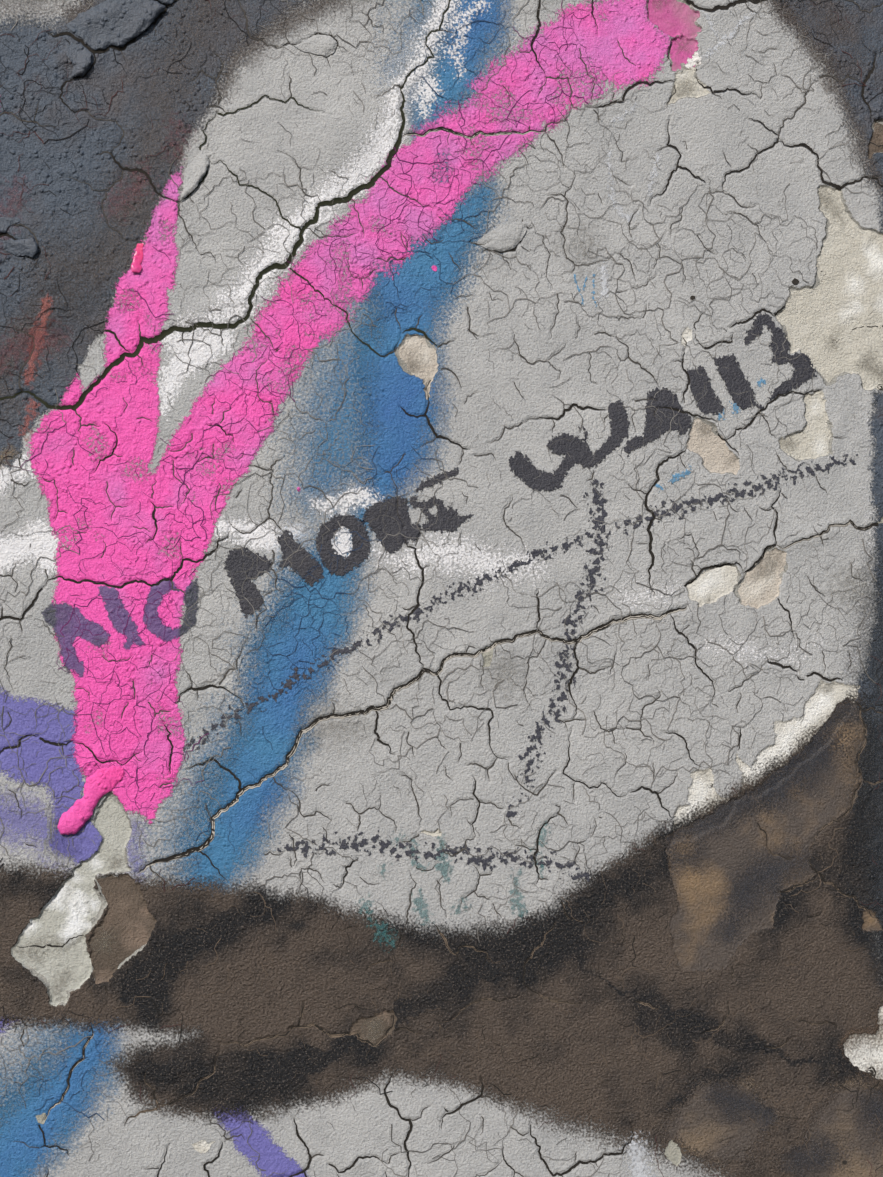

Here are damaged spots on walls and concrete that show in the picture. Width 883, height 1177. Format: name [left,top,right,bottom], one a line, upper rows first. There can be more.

crack [132,0,424,150]
spalling [774,185,883,461]
peeling [395,334,439,399]
crack [440,368,477,416]
peeling [686,417,740,475]
crack [503,476,586,553]
peeling [686,546,788,609]
crack [25,824,84,874]
spalling [11,766,157,1006]
crack [366,854,438,973]
crack [435,876,446,914]
peeling [655,1006,883,1177]